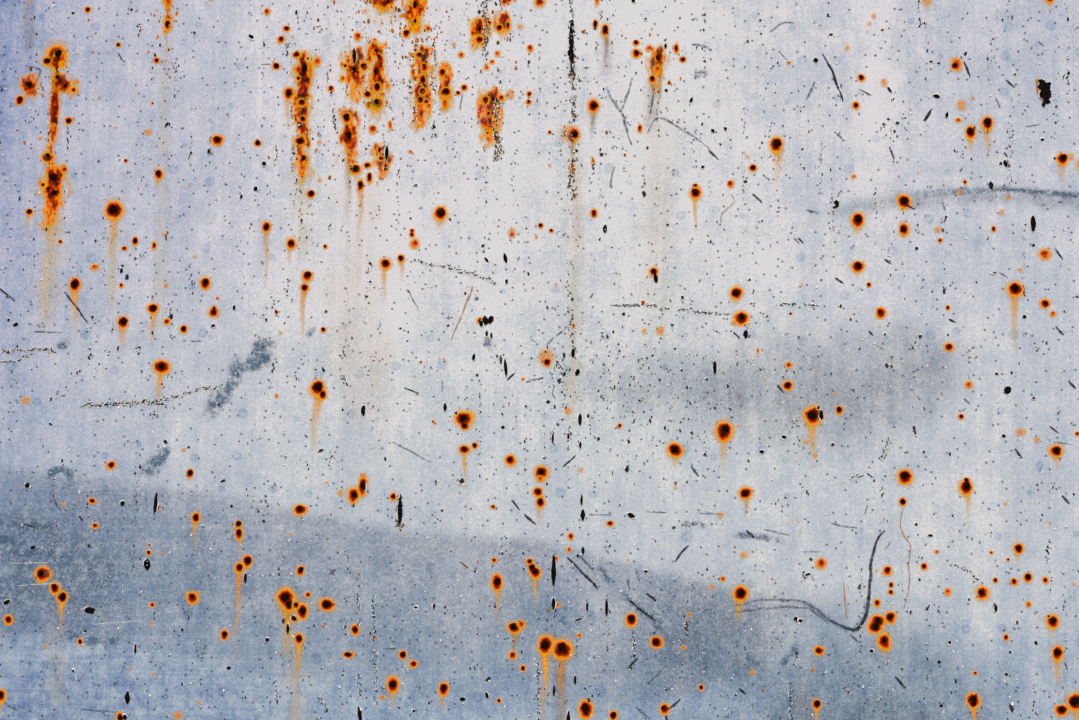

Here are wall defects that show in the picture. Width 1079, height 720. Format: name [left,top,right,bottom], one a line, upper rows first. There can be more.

rust [632,39,686,93]
rust [15,44,79,244]
rust [272,50,321,198]
rust [104,201,138,251]
rust [454,411,475,430]
rust [714,421,739,445]
rust [803,406,821,443]
rust [276,587,335,669]
rust [538,633,581,691]
rust [1054,692,1079,718]